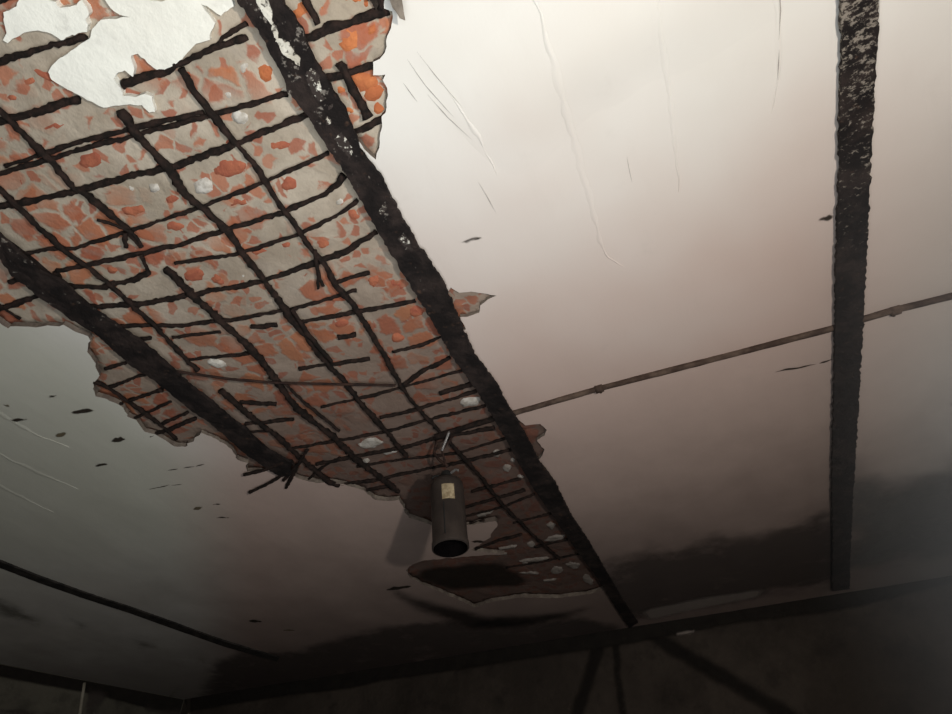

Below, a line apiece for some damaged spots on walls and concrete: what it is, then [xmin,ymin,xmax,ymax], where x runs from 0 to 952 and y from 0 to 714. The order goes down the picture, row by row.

crack [404,52,471,139]
spalling [0,0,602,604]
leakage [645,591,759,619]